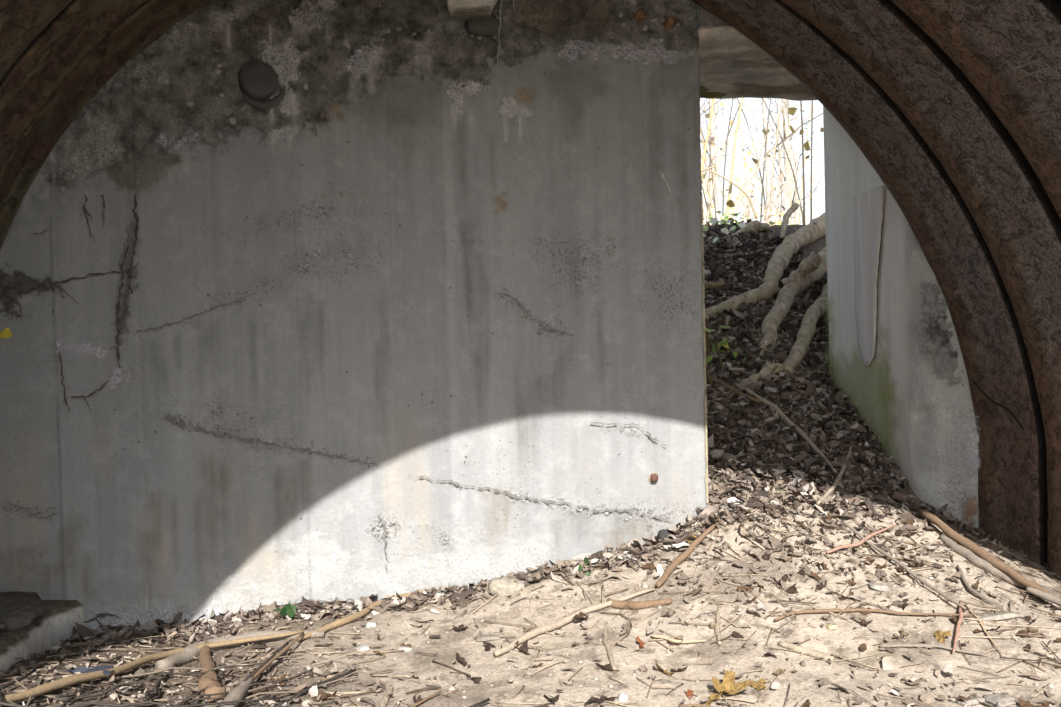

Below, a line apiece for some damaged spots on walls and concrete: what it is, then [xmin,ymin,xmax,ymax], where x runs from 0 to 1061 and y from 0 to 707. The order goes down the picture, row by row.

water stain [206,0,339,142]
efflorescence [342,39,384,78]
efflorescence [446,78,487,117]
water stain [102,127,199,189]
crack [15,193,256,412]
crack [498,292,574,336]
crack [163,413,379,466]
crack [592,422,666,446]
crack [408,474,673,522]